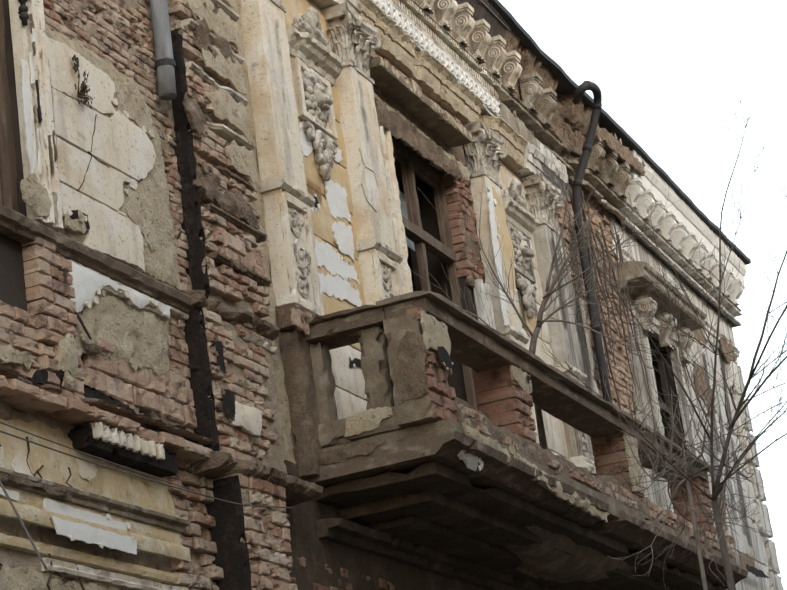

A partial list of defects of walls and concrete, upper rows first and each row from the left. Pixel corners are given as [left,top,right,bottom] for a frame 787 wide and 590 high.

spalling [191,1,236,63]
peeling [20,13,90,234]
crack [77,114,110,191]
spalling [111,84,154,138]
spalling [182,92,211,138]
spalling [124,179,166,252]
peeling [309,179,362,307]
spalling [0,260,171,393]
spalling [83,385,199,443]
spalling [344,406,393,437]
spalling [458,450,484,471]
spalling [462,422,610,522]